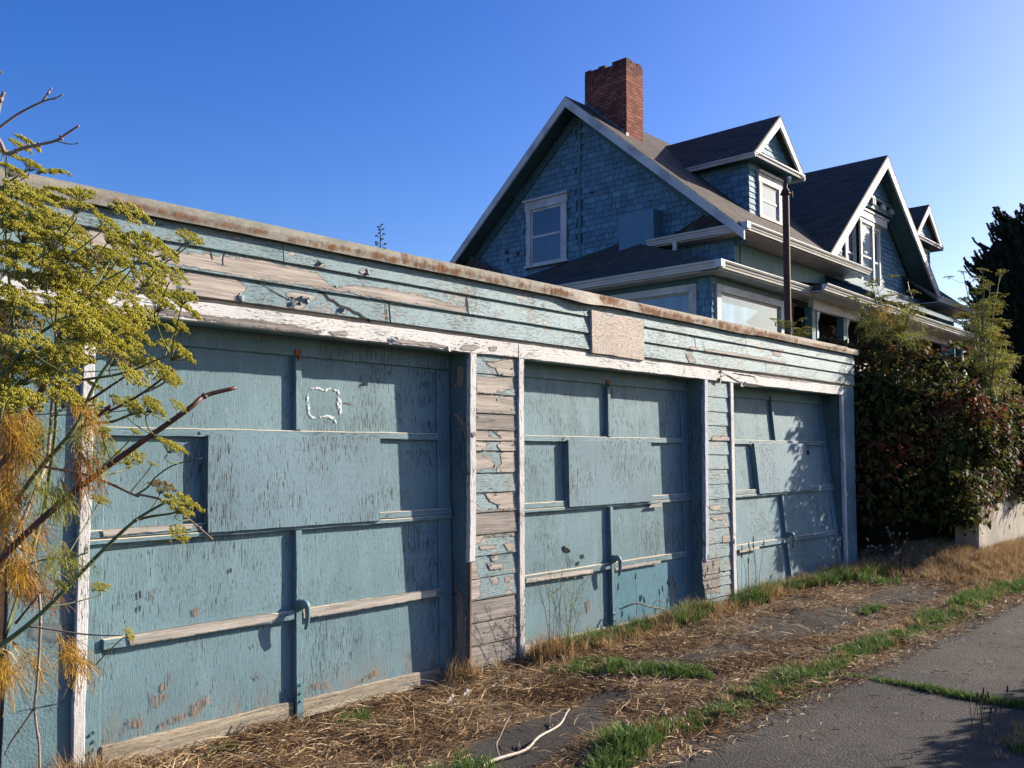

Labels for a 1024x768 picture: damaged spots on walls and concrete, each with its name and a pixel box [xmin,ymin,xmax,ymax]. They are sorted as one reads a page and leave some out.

peeling [87,225,467,315]
corrosion [316,244,569,296]
peeling [114,305,348,336]
corrosion [639,303,798,343]
peeling [701,558,721,593]